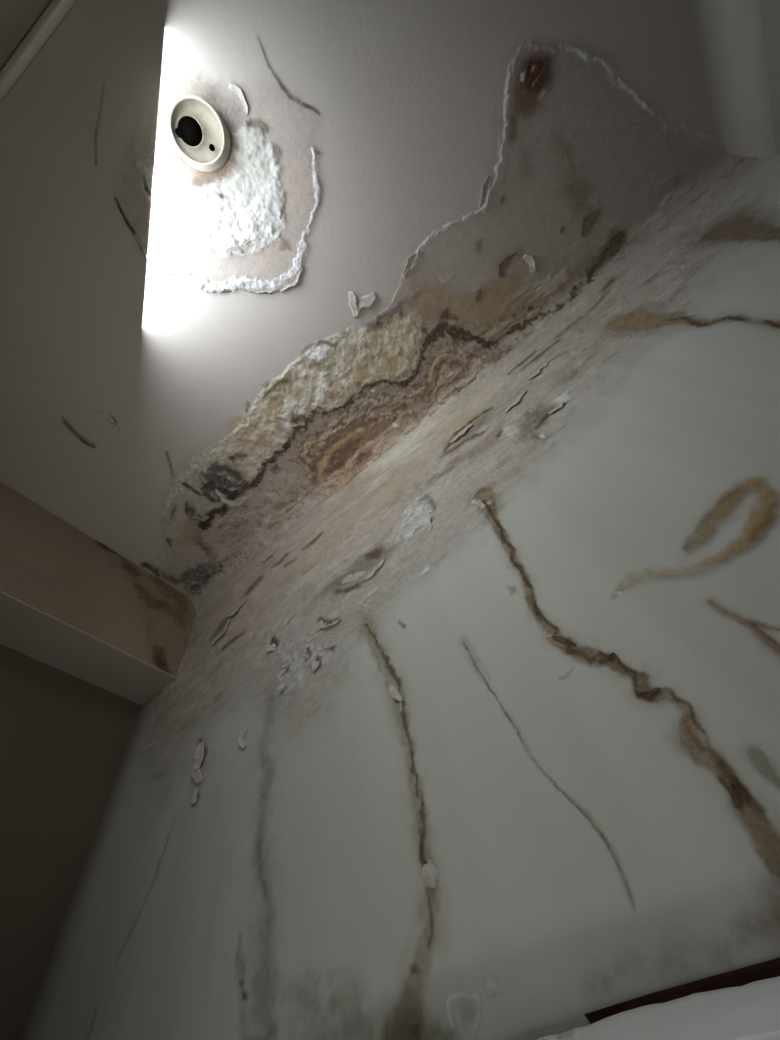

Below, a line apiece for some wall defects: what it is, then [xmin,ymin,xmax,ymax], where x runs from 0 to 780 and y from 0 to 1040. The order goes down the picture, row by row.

peeling [114,84,321,294]
leakage [702,217,780,241]
leakage [607,310,780,331]
spalling [148,43,746,764]
leakage [660,477,777,576]
leakage [709,601,780,653]
crack [465,645,534,760]
leakage [749,748,780,786]
crack [554,782,603,838]